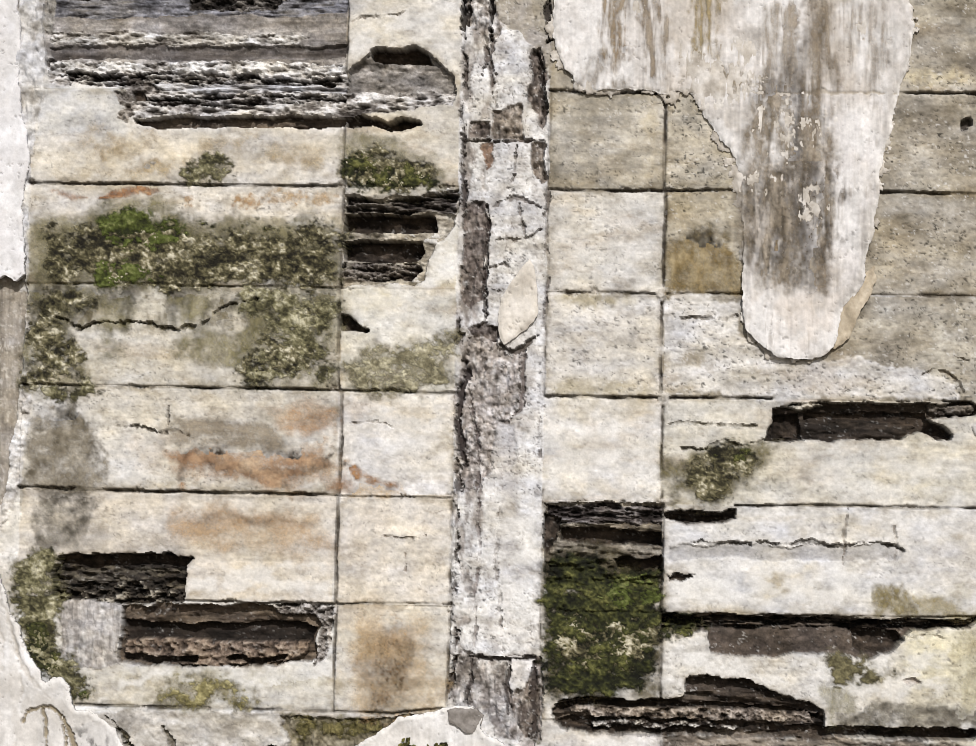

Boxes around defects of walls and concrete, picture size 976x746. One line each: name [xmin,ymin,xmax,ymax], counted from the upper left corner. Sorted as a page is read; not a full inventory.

spalling [41,0,457,130]
crack [56,296,259,333]
damp [22,200,338,371]
spalling [342,189,539,493]
peeling [925,403,976,417]
damp [661,453,710,503]
damp [716,444,770,496]
spalling [542,500,665,586]
crack [691,507,905,570]
spalling [50,551,337,670]
spalling [692,611,976,660]
spalling [446,649,825,746]